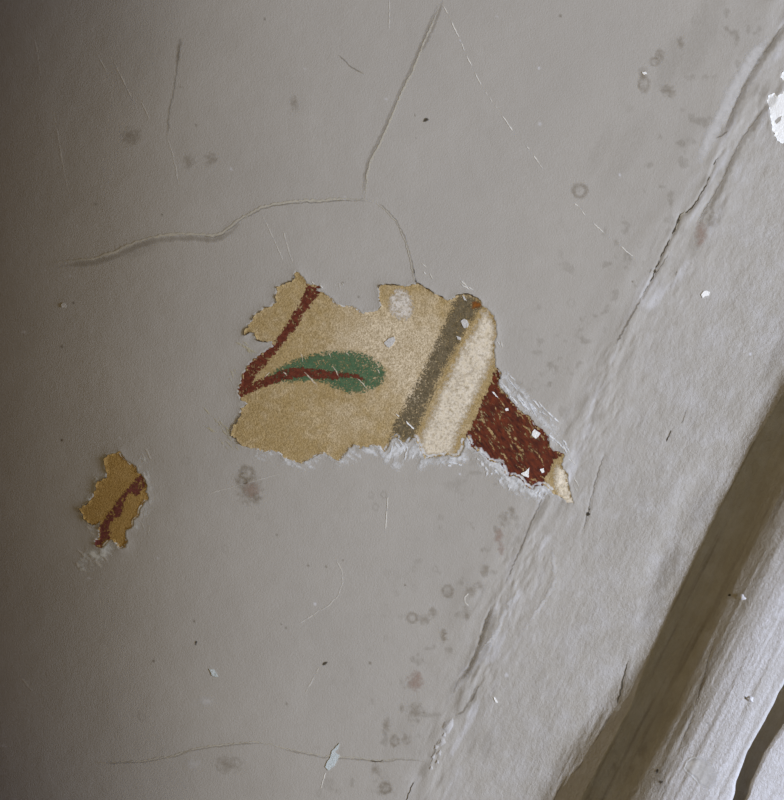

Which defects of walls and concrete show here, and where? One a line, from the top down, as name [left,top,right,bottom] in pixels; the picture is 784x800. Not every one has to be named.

crack [74,18,435,261]
flaking render [767,92,784,144]
peeling [208,272,579,503]
peeling [78,451,148,570]